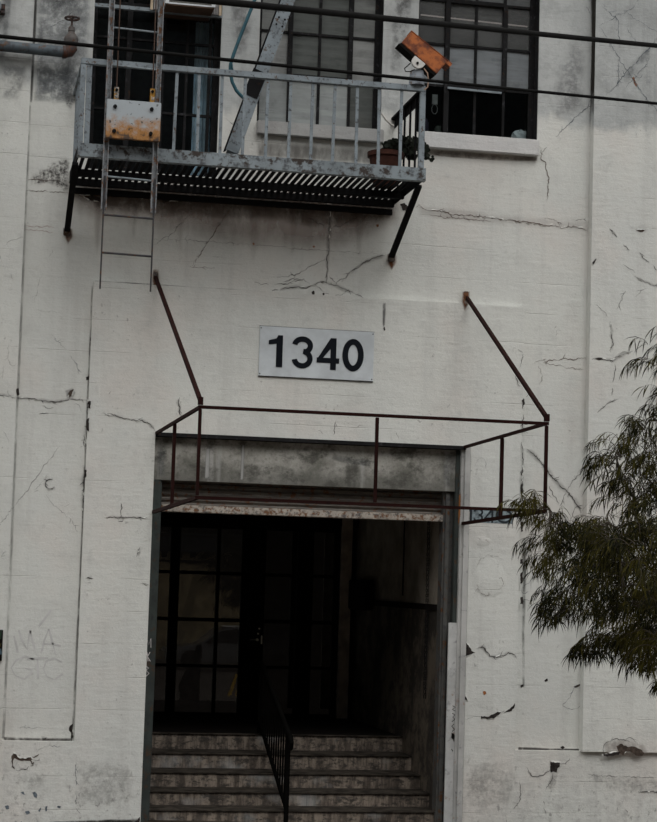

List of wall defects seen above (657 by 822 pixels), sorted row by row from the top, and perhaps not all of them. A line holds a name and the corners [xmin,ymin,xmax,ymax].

crack [602,5,657,111]
crack [417,108,586,231]
crack [257,210,385,298]
crack [0,356,154,447]
crack [515,228,657,522]
crack [2,449,85,532]
spalling [10,752,39,771]
spalling [549,761,561,772]
spalling [602,744,644,756]